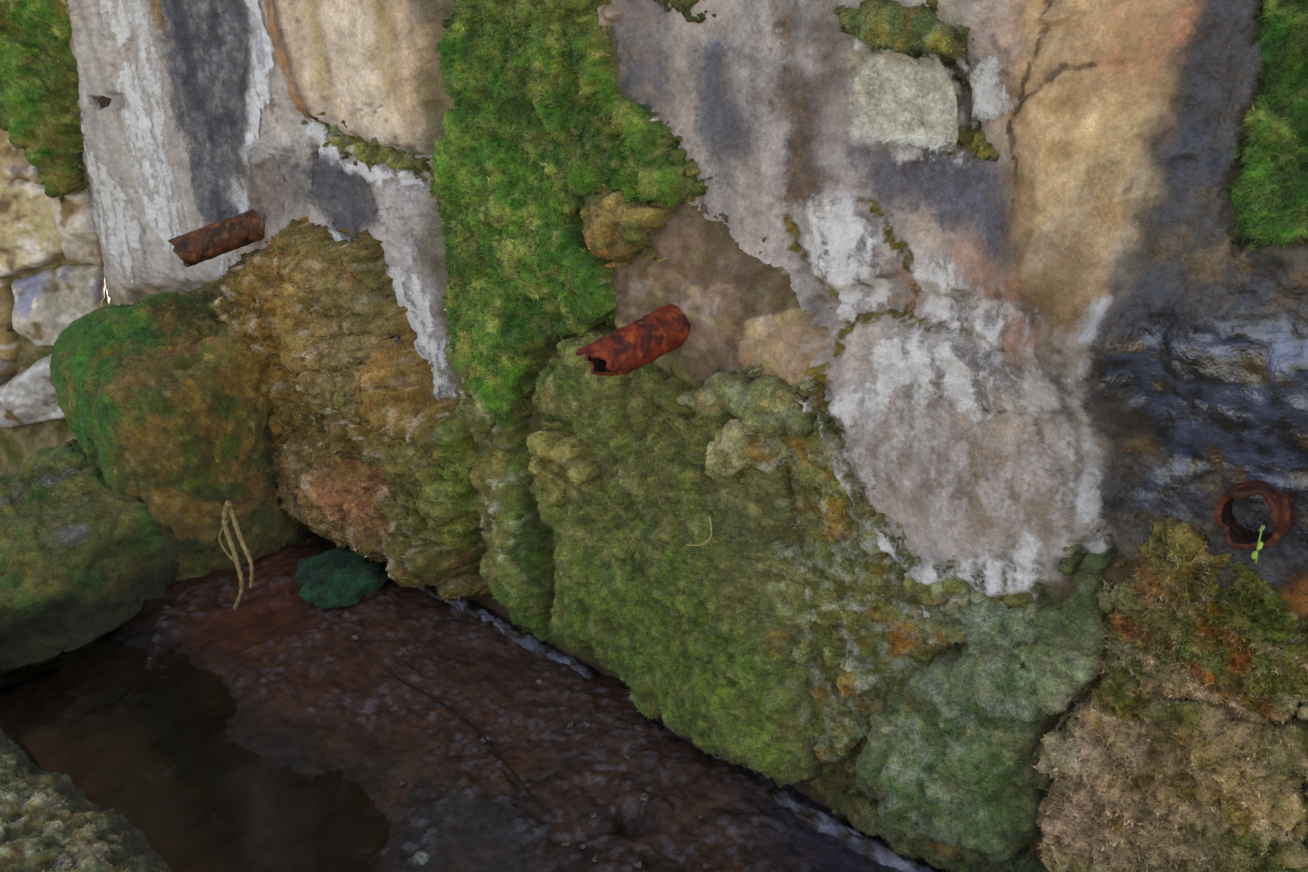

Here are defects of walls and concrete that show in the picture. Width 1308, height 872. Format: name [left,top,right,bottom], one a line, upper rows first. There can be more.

damp [690,0,892,321]
damp [794,0,1308,598]